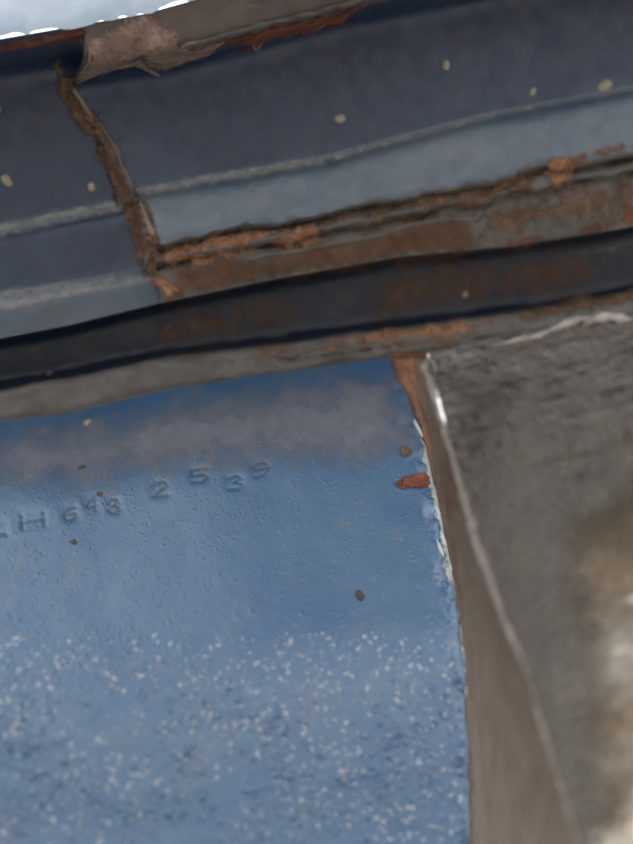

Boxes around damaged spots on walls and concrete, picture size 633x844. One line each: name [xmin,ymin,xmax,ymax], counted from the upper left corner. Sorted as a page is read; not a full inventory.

peeling [76,0,385,83]
peeling [136,113,496,195]
rust [150,143,633,301]
rust [247,288,633,624]
damp [600,627,633,708]
damp [591,802,633,844]